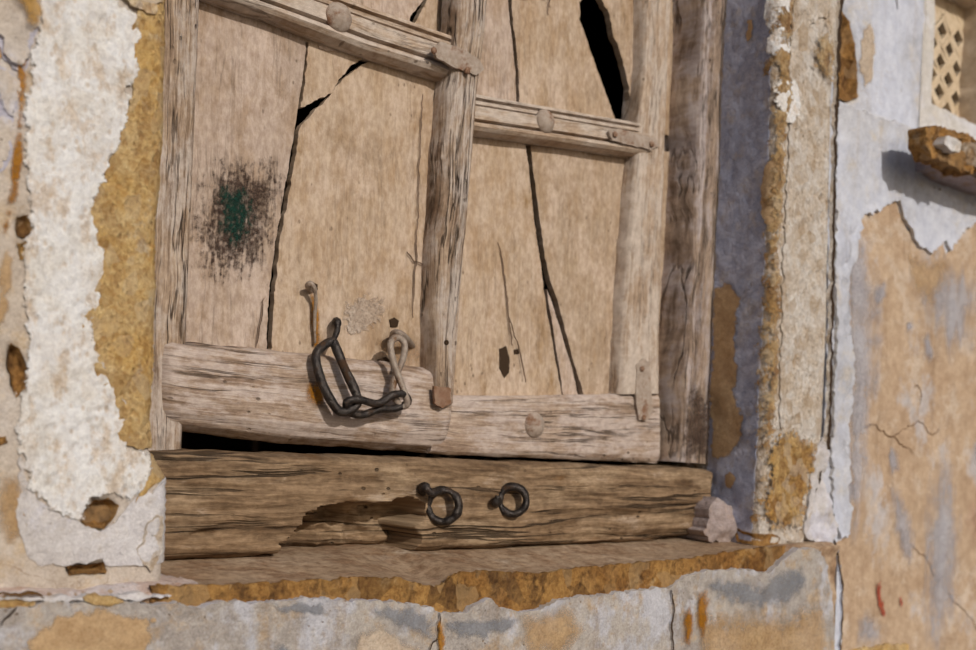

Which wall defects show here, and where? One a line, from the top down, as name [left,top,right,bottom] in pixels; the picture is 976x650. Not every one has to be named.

corrosion [4,63,26,229]
spalling [0,0,165,520]
spalling [0,514,786,650]
flaking render [708,283,743,459]
spalling [750,0,818,531]
crack [815,0,940,492]
flaking render [812,11,976,650]